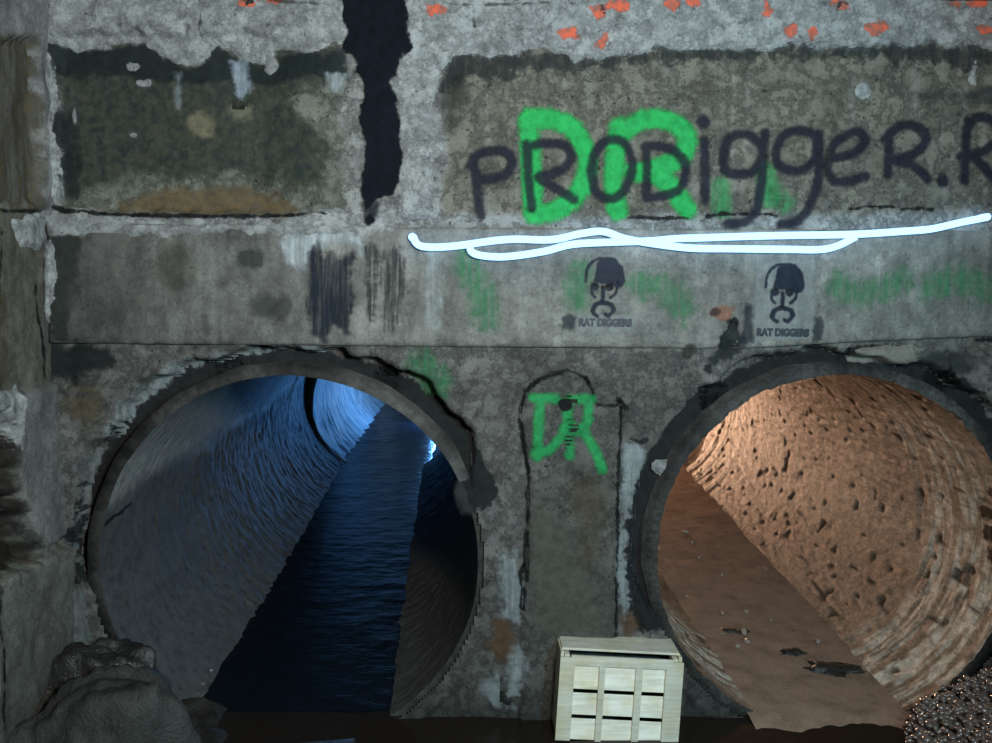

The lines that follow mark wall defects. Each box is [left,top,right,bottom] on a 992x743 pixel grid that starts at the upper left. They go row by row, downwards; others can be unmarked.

water stain [50,235,116,384]
water stain [104,232,404,437]
water stain [362,201,379,225]
flaking render [11,0,992,328]